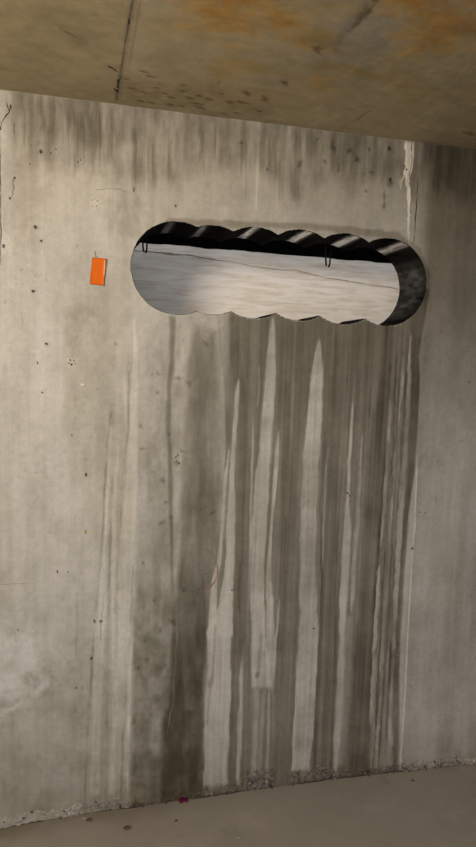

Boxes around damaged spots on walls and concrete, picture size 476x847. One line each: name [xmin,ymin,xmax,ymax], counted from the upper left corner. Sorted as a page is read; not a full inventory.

water stain [0,69,407,219]
water stain [82,140,476,804]